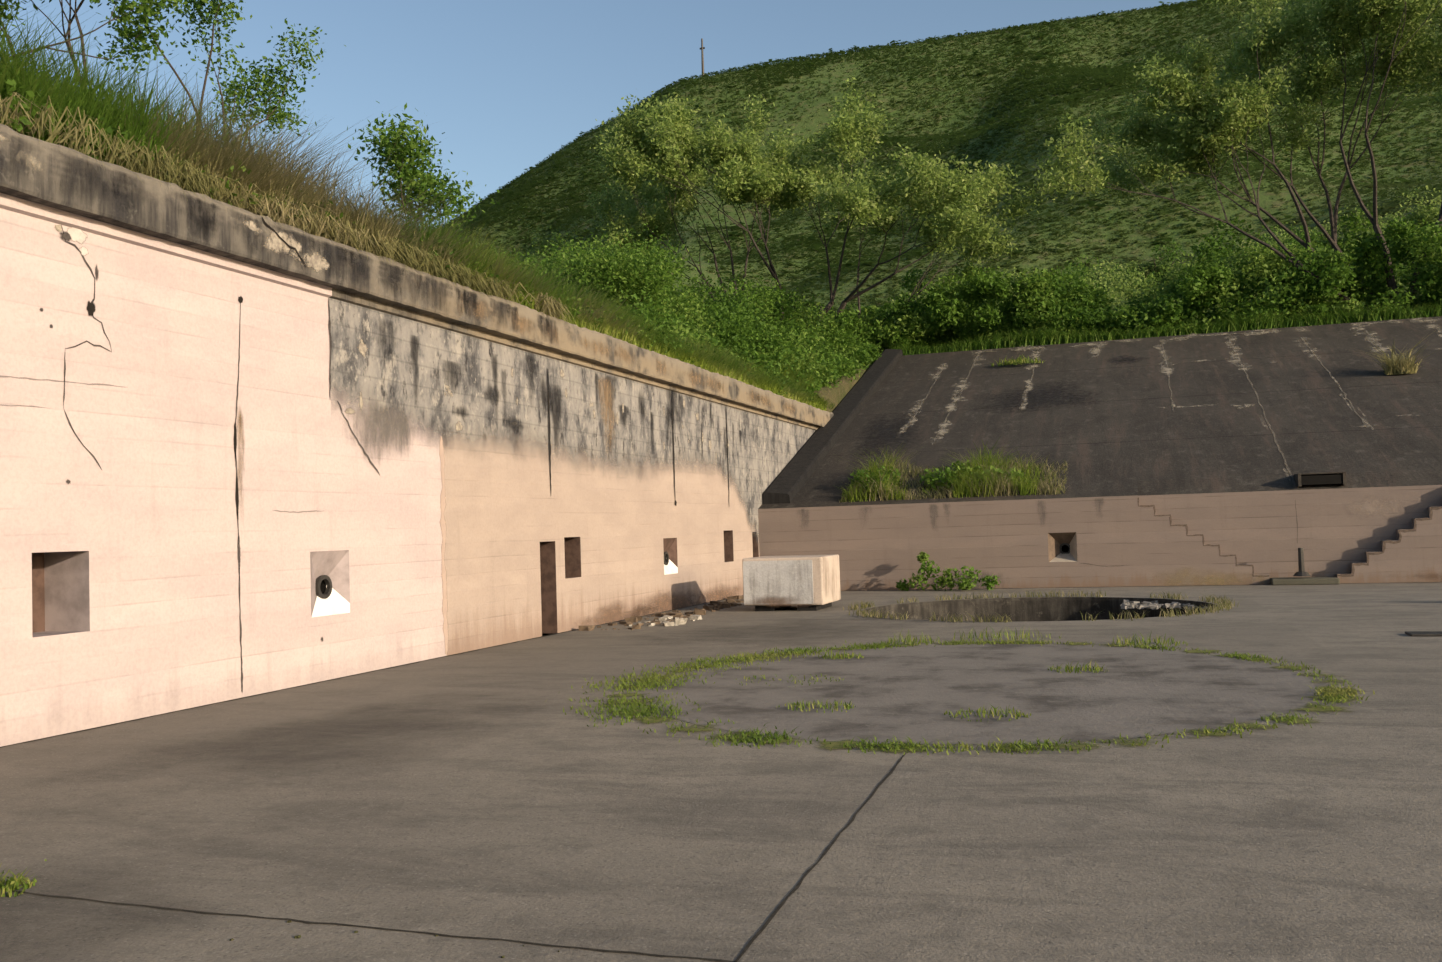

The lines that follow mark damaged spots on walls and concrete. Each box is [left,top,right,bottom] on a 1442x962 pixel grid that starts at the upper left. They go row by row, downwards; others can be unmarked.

water stain [188,197,208,232]
water stain [290,231,400,288]
water stain [431,280,477,310]
crack [60,225,112,470]
water stain [365,408,408,447]
crack [234,303,243,692]